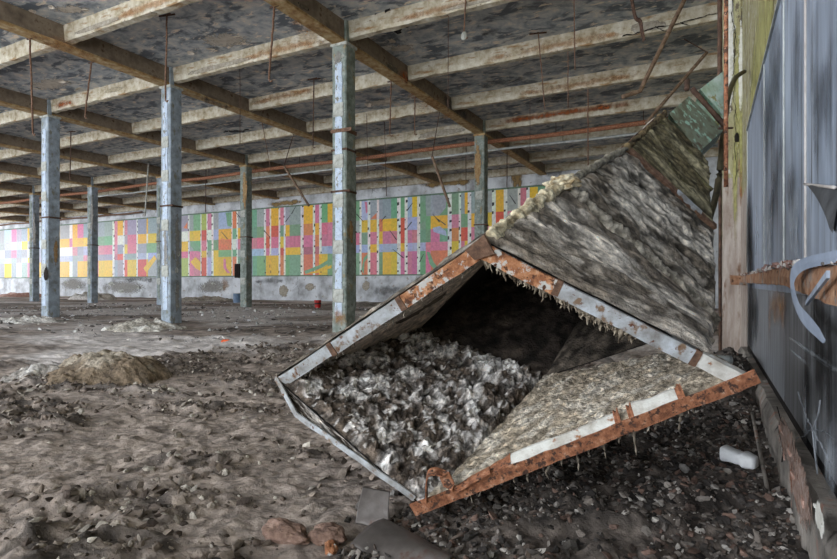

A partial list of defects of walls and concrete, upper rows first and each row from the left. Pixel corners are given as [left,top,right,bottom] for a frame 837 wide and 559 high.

rust [512,104,620,122]
crack [622,0,737,181]